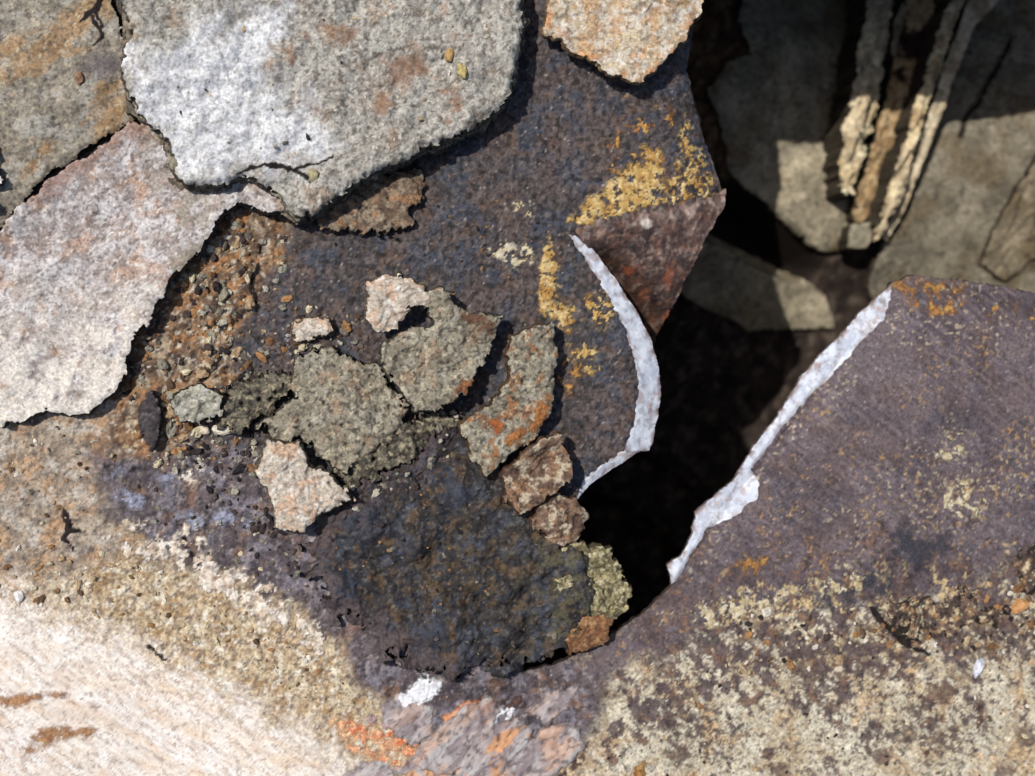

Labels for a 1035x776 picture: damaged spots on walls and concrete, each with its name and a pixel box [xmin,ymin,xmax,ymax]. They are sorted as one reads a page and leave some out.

crack [79,0,104,46]
peeling [0,0,704,239]
crack [237,155,334,183]
corrosion [892,280,966,316]
peeling [253,231,633,655]
efflorescence [112,467,146,509]
efflorescence [178,508,253,530]
leakage [822,523,953,611]
corrosion [443,698,483,723]
corrosion [500,695,526,721]
corrosion [326,716,419,767]
corrosion [557,742,588,776]